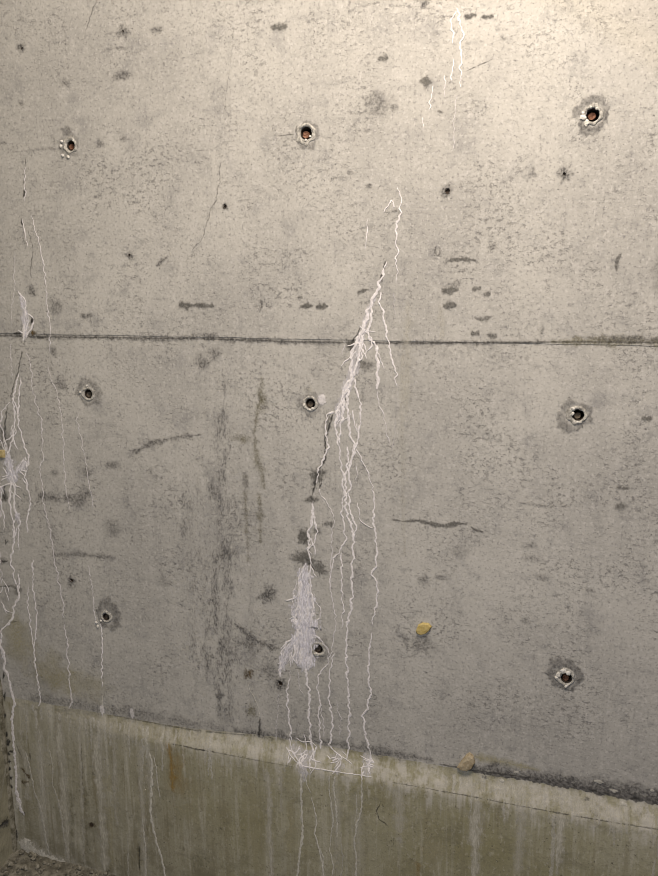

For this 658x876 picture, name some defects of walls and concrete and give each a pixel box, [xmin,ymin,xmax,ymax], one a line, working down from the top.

damp [11,257,35,342]
damp [22,215,58,353]
crack [305,394,347,502]
crack [291,522,332,576]
damp [235,187,402,876]
damp [0,345,197,876]
efflorescence [452,775,483,876]